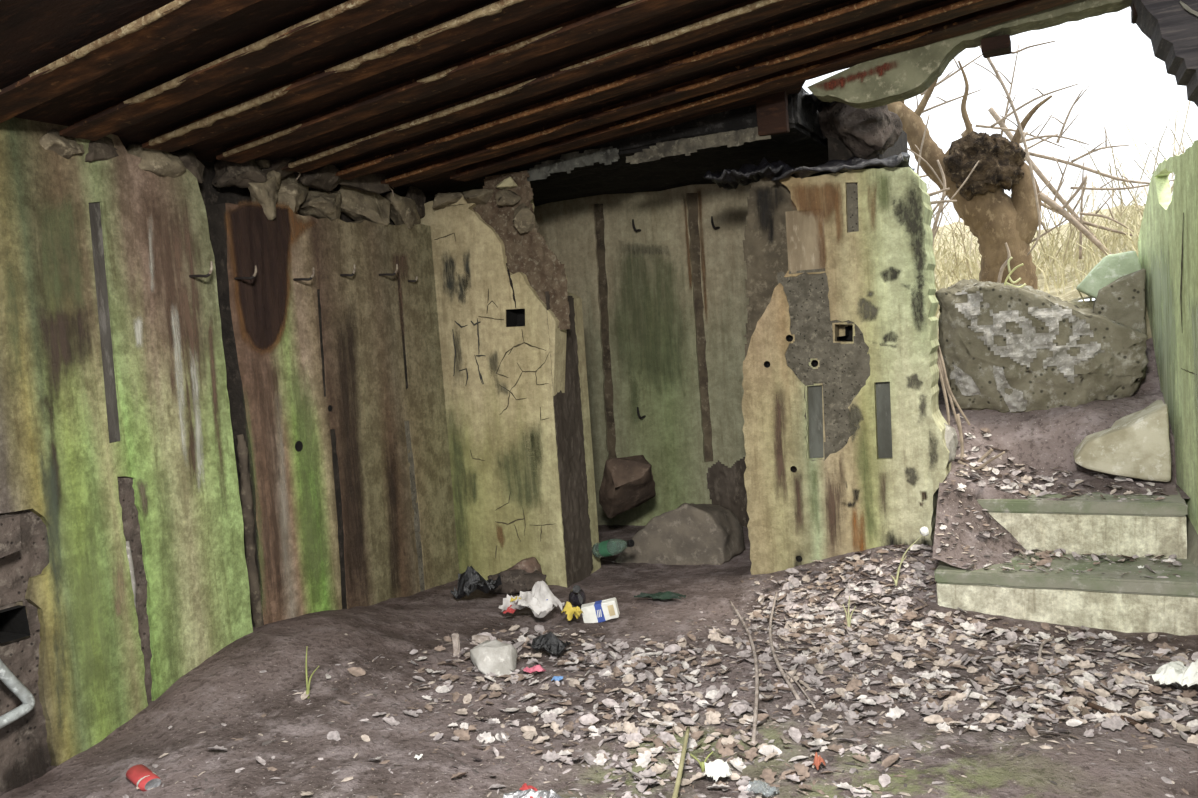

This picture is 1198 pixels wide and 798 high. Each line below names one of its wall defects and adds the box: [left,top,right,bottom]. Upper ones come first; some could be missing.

leakage [43,441,60,602]
leakage [41,205,91,421]
leakage [151,208,223,472]
leakage [231,205,291,349]
leakage [251,364,286,593]
crack [478,263,549,420]
spalling [473,127,771,588]
spalling [743,175,898,461]
peeling [882,188,926,328]
peeling [907,374,925,416]
spalling [0,509,51,792]